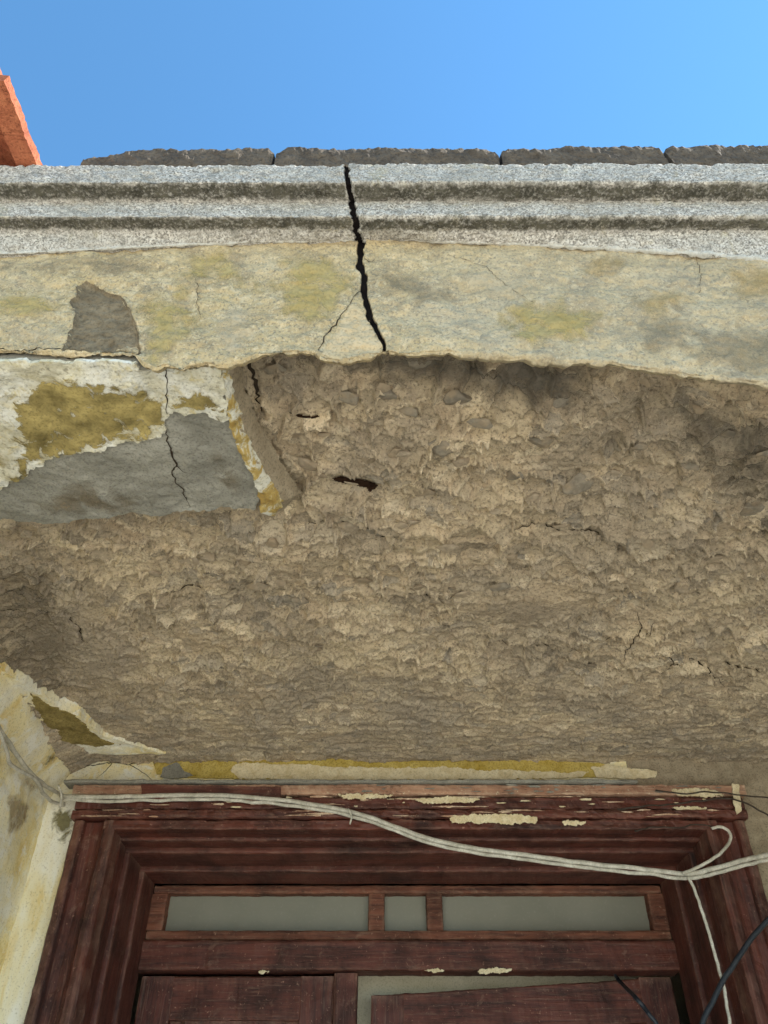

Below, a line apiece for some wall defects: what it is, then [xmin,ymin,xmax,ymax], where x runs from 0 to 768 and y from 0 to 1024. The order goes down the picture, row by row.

spalling [62,281,141,355]
crack [319,166,386,351]
crack [165,370,190,506]
crack [247,363,262,411]
flaking render [0,354,768,826]